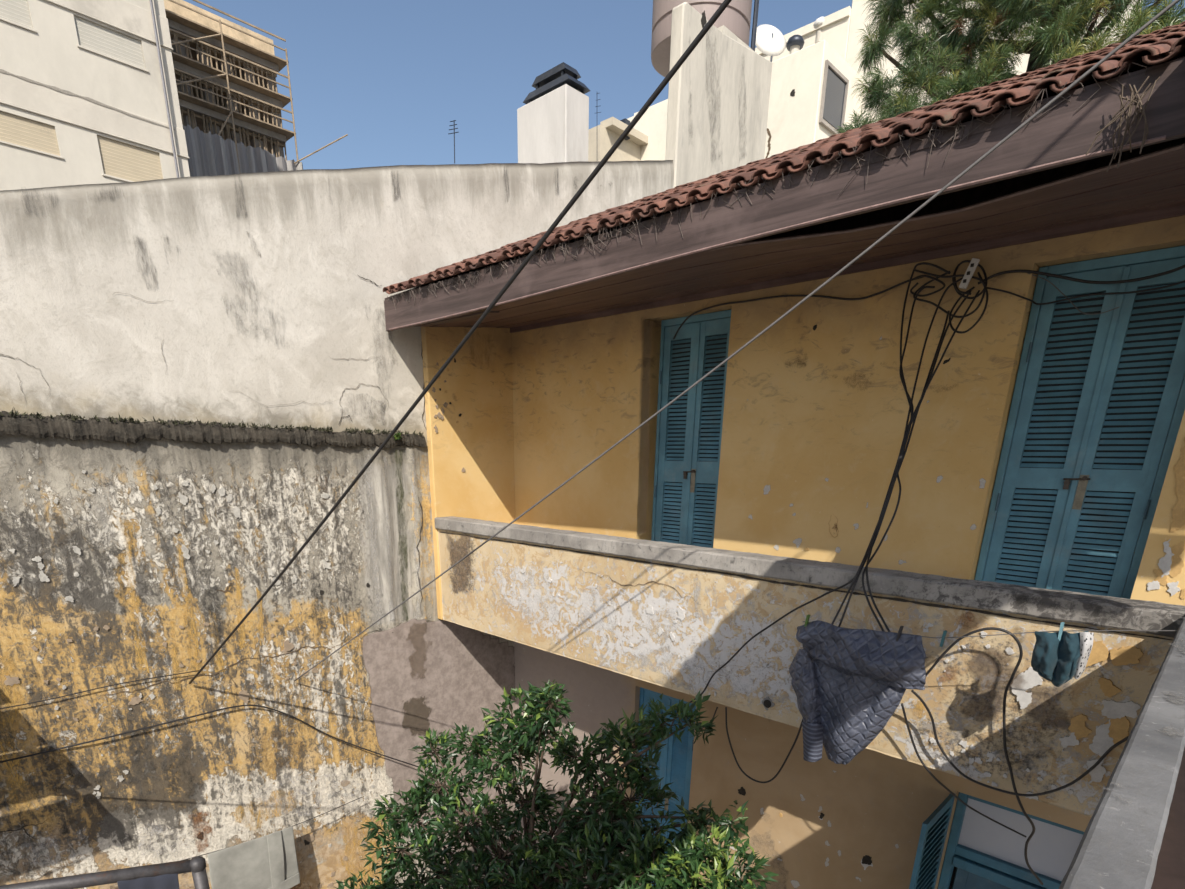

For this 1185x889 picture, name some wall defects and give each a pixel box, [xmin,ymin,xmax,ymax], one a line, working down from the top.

peeling [178,481,203,511]
peeling [211,484,242,518]
peeling [1147,437,1185,599]
peeling [174,528,190,559]
peeling [32,556,50,582]
peeling [261,559,306,595]
peeling [1086,640,1143,667]
peeling [128,693,155,710]
leakage [402,697,431,736]
peeling [1011,667,1043,709]
peeling [1059,677,1141,784]
peeling [934,740,1007,787]